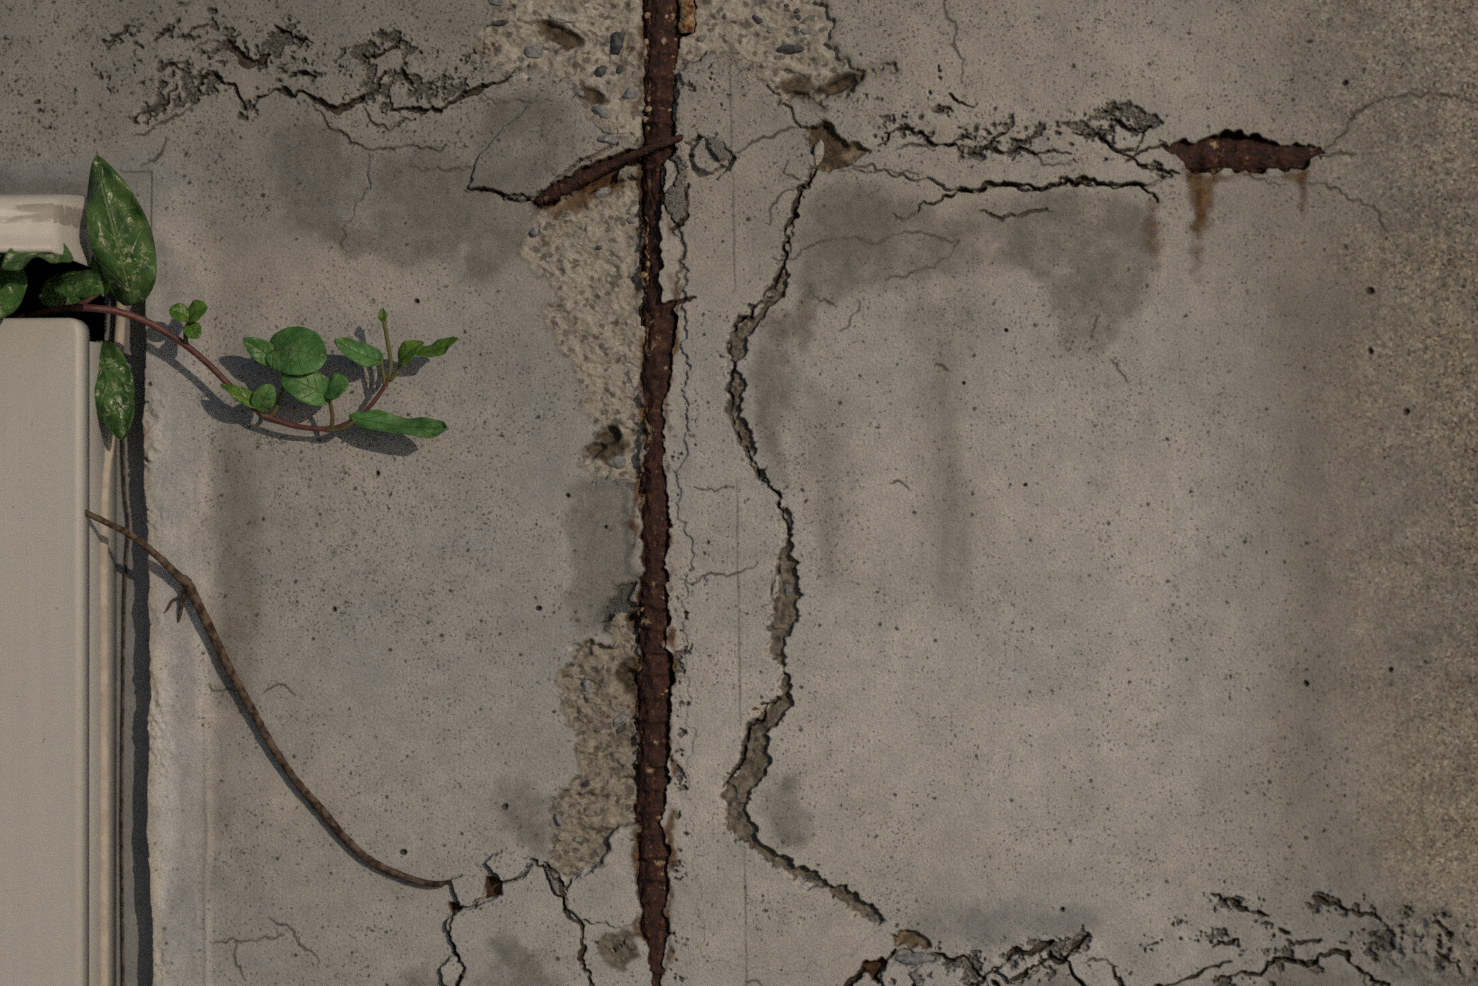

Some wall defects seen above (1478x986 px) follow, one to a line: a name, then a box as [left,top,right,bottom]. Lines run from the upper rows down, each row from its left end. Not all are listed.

crack [106,24,537,242]
spalling [476,0,688,486]
spalling [673,0,899,174]
corrosion [1183,168,1222,231]
crack [1242,91,1477,232]
crack [684,0,1180,986]
crack [449,908,465,986]
crack [530,858,595,986]
corrosion [632,807,676,966]
crack [935,893,1390,986]
crack [1431,919,1462,975]